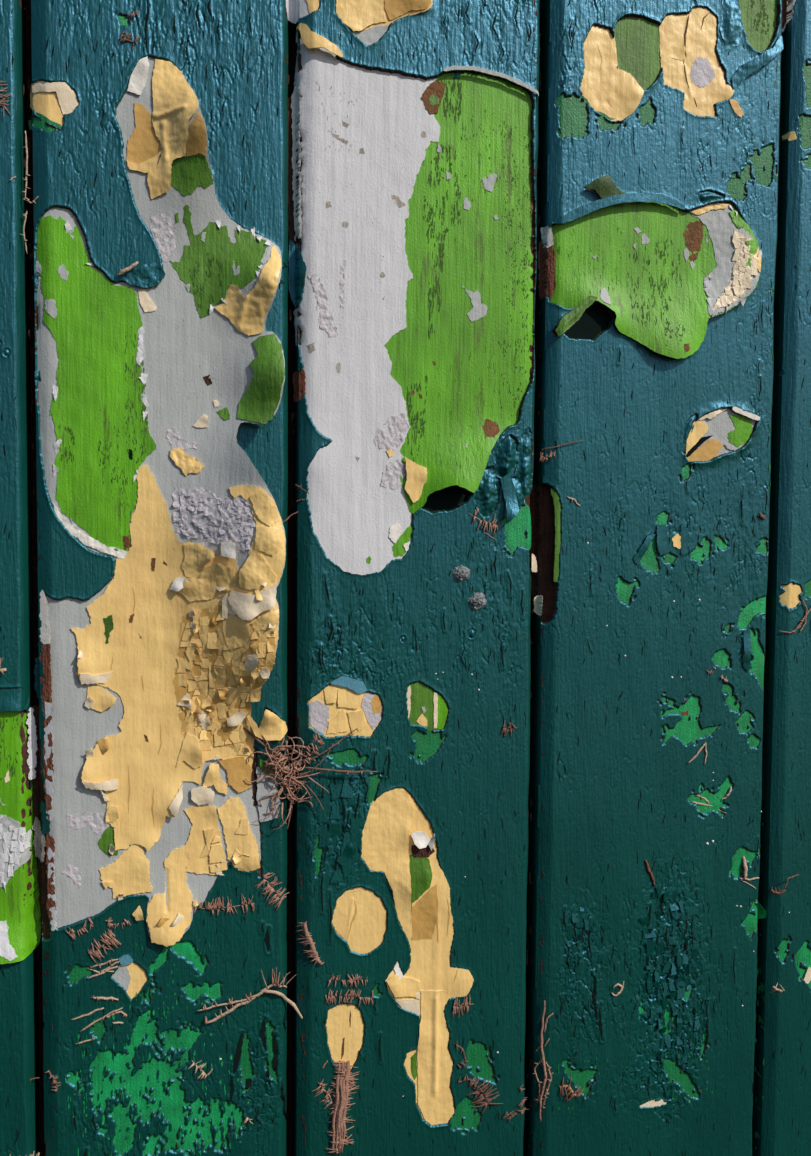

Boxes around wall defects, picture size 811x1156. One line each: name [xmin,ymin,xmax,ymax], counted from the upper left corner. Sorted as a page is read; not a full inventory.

crack [68,164,124,235]
crack [45,0,278,216]
peeling [286,0,776,582]
crack [662,100,776,214]
peeling [739,0,796,52]
peeling [782,62,811,169]
peeling [0,57,288,1156]
crack [556,265,811,781]
peeling [660,693,718,745]
peeling [308,682,496,1133]
crack [203,878,287,1156]
crack [358,982,381,1101]